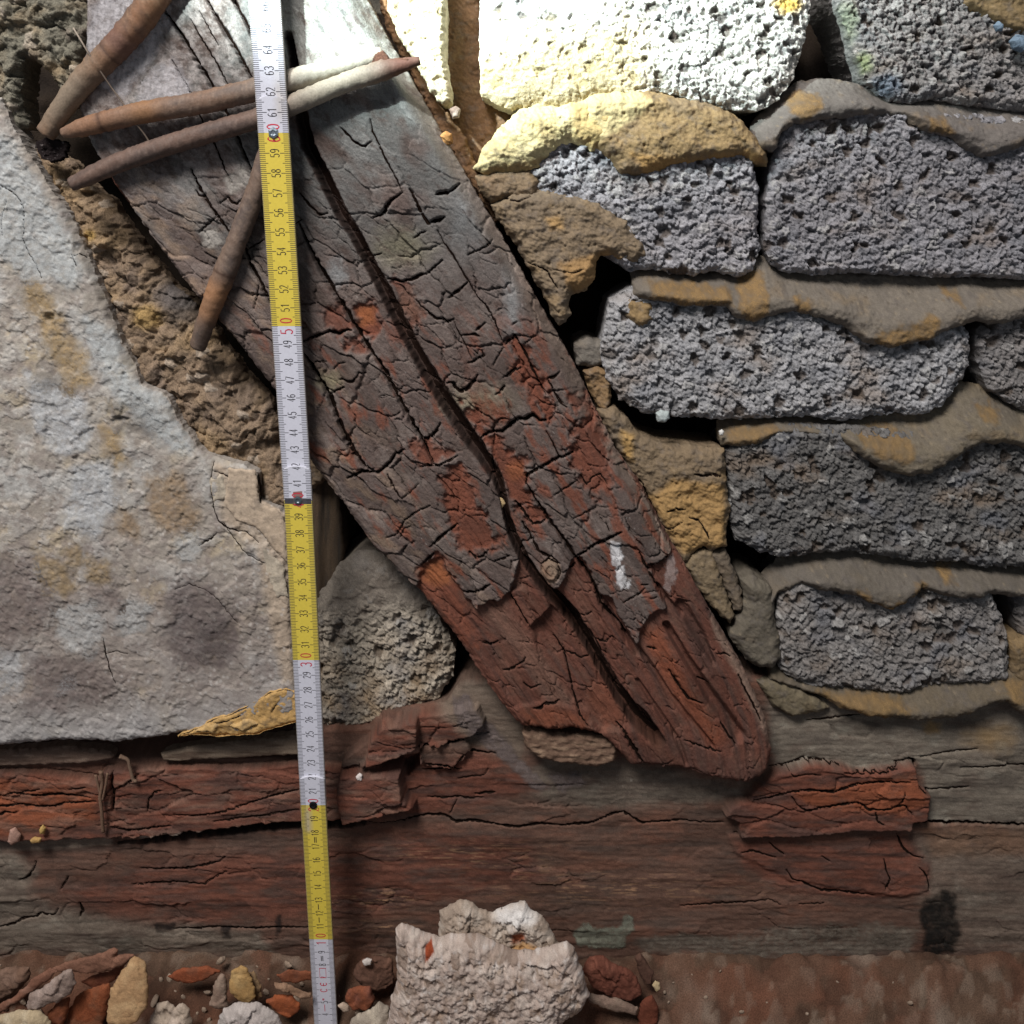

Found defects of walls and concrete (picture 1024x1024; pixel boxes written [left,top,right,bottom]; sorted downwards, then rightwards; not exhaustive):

crack [199,462,264,563]
crack [103,639,128,683]
crack [369,731,717,828]